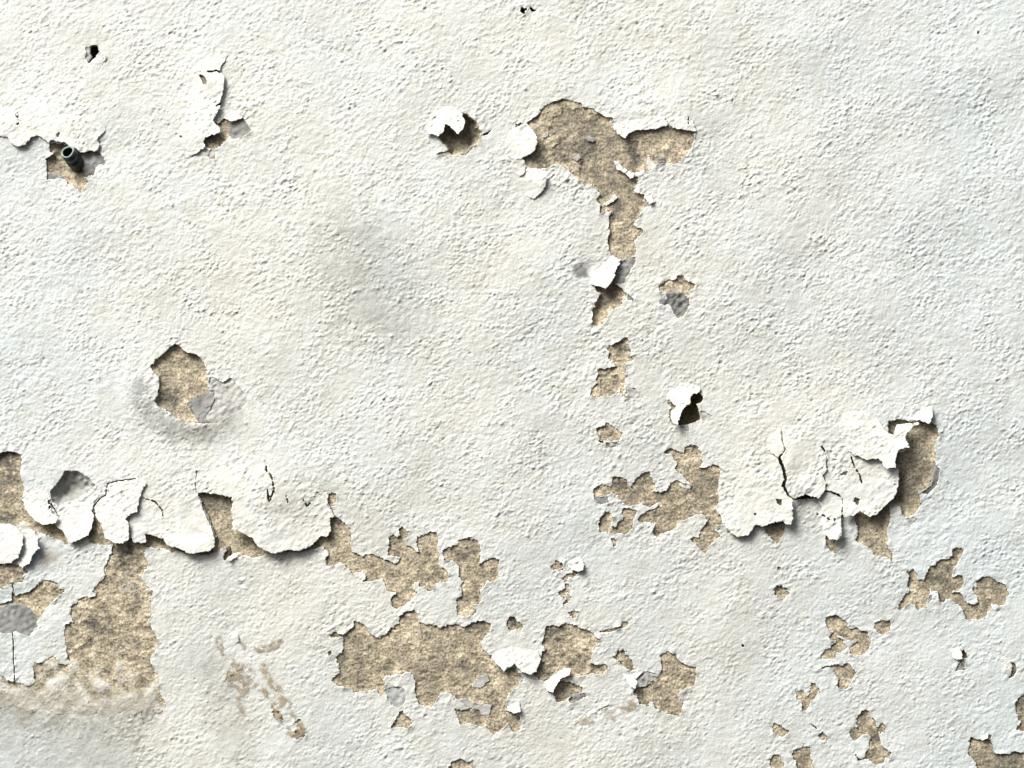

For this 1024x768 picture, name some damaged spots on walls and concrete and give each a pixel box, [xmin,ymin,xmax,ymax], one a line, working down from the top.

peeling [0,106,106,192]
peeling [176,52,251,159]
flaking render [426,106,490,157]
peeling [504,99,696,326]
peeling [151,344,247,423]
peeling [590,338,637,399]
peeling [593,406,940,561]
peeling [0,451,696,739]
peeling [898,548,1009,620]
peeling [968,733,1024,768]